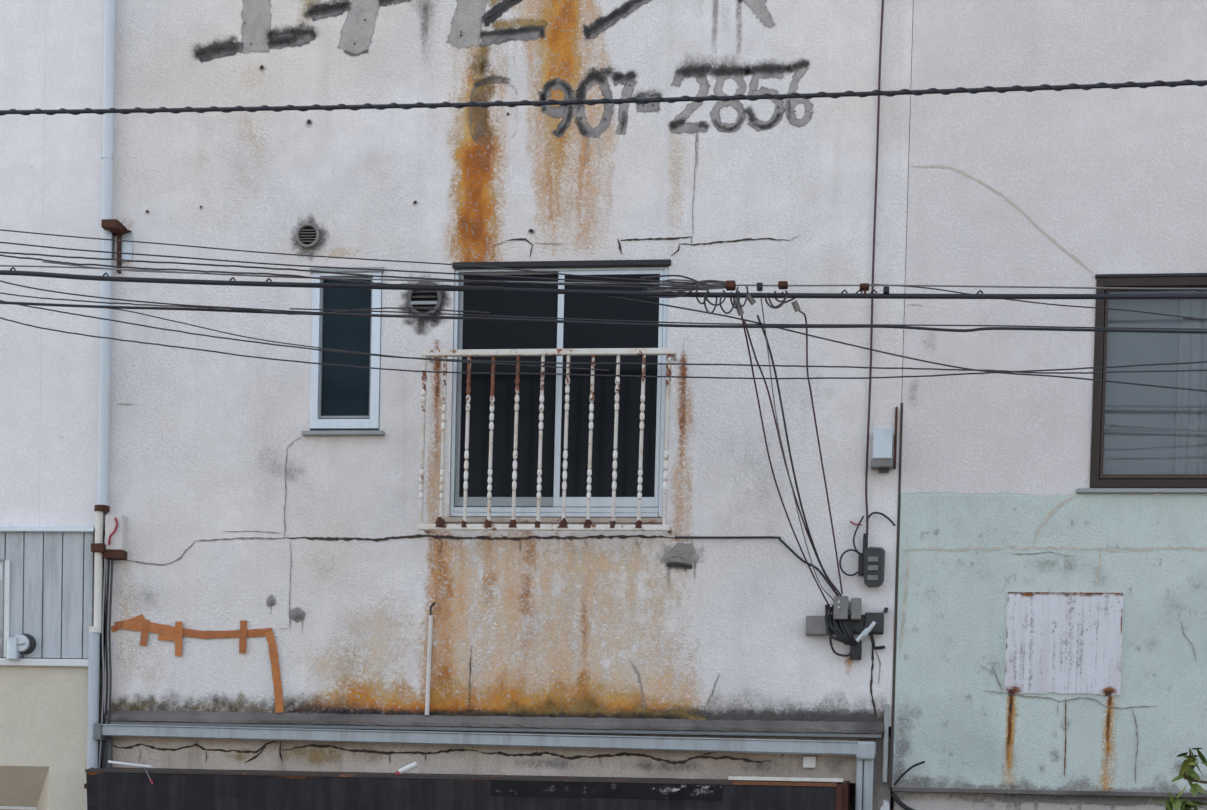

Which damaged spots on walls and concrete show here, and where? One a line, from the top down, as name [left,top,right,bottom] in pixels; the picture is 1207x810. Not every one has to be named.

corrosion [453,50,505,262]
crack [492,238,558,256]
corrosion [519,0,613,239]
crack [617,138,799,256]
crack [913,165,1094,274]
crack [126,437,673,629]
corrosion [287,357,699,719]
crack [870,495,1207,718]
corrosion [1007,592,1123,632]
crack [113,738,784,768]
corrosion [1004,687,1020,789]
corrosion [1102,687,1115,791]